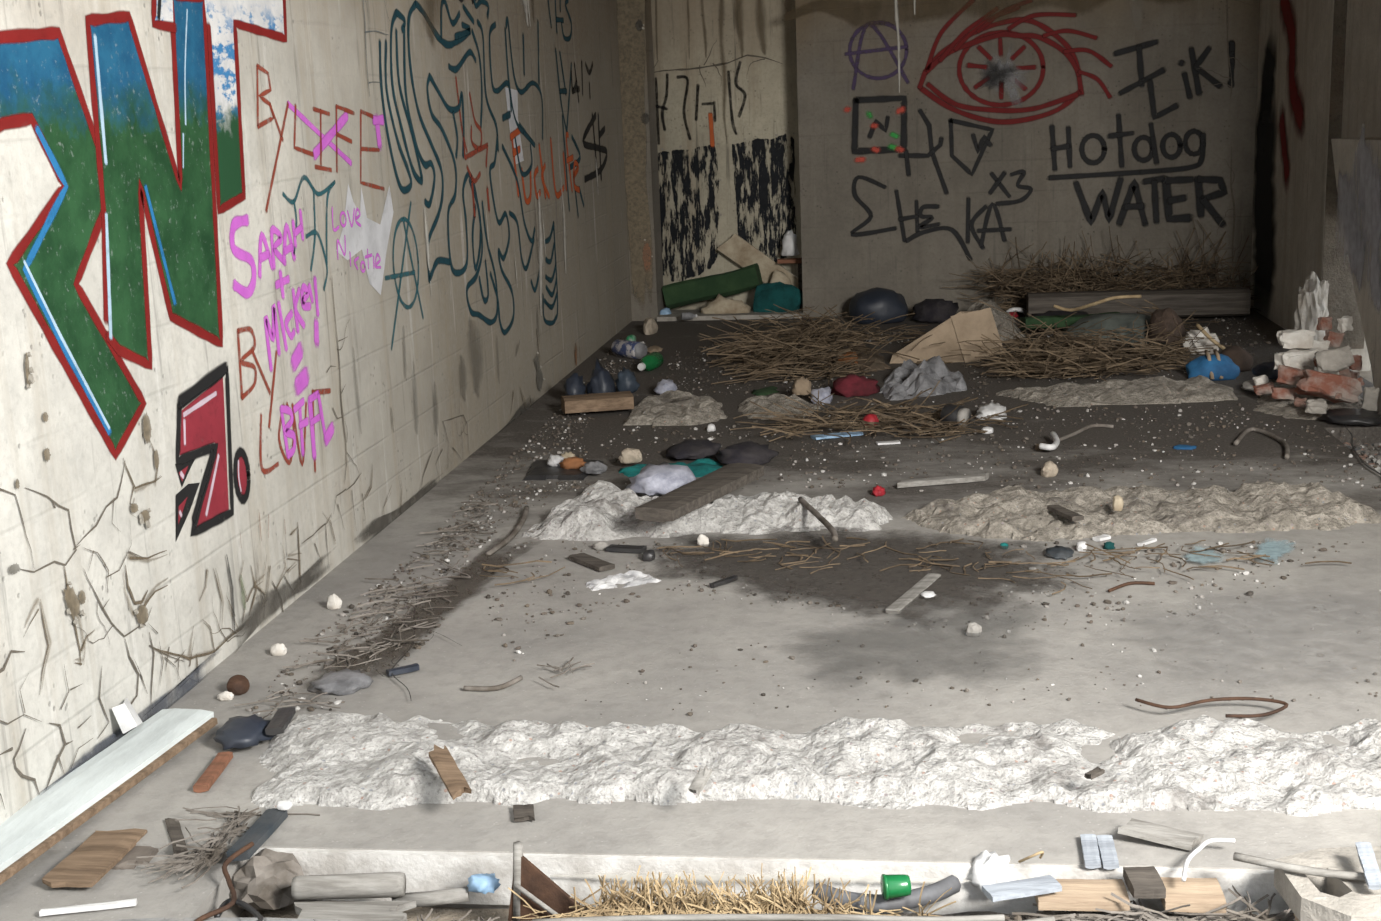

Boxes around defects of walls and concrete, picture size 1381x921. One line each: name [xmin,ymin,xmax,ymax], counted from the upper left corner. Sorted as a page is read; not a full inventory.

crack [363,1,392,95]
crack [0,281,469,809]